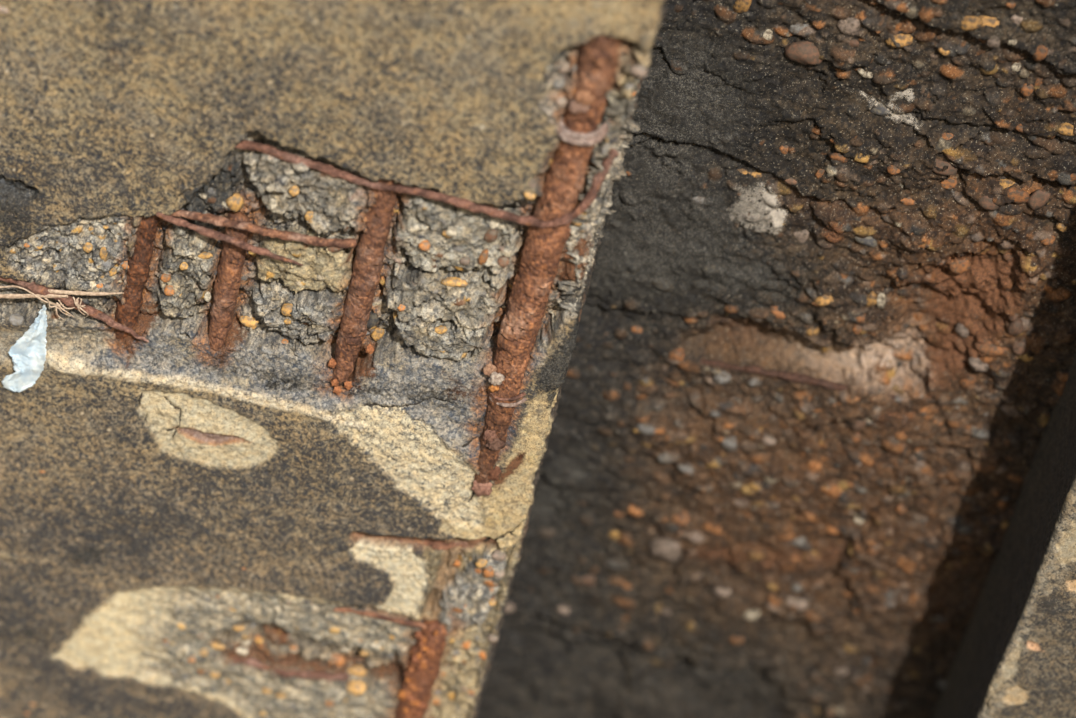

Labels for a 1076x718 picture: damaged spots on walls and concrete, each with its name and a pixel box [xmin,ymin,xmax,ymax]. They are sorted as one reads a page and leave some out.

rust [568,90,595,114]
damp [537,19,816,409]
rust [558,236,591,281]
rust [115,302,162,366]
rust [218,314,247,360]
spalling [0,33,649,718]
rust [328,338,377,396]
rust [447,362,505,401]
spalling [674,238,1043,403]
rust [911,250,1030,399]
rust [471,452,525,497]
damp [526,438,609,539]